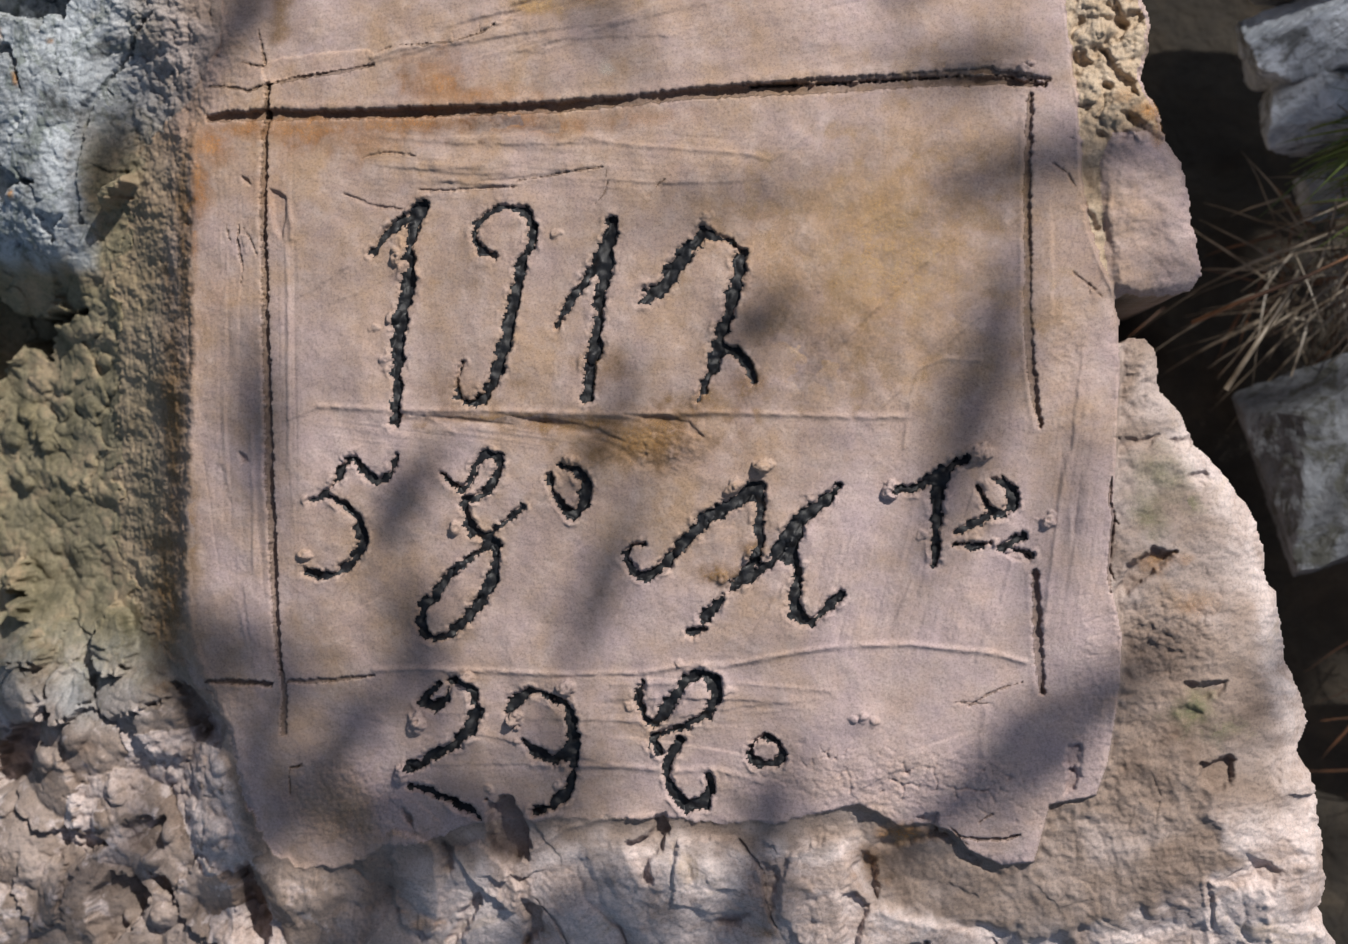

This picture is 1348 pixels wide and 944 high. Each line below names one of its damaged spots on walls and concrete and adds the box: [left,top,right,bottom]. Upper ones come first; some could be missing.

spalling [1053,0,1157,277]